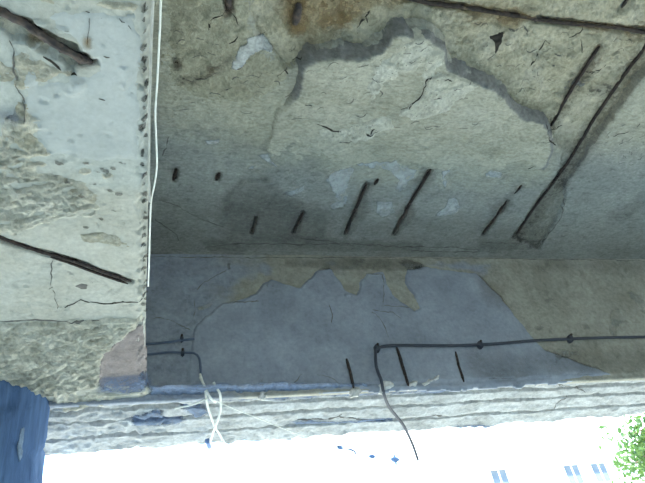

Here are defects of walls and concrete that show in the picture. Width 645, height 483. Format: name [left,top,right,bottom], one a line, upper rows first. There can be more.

crack [9,40,26,122]
spalling [158,0,645,247]
crack [0,261,143,324]
spalling [53,254,152,412]
spalling [346,358,362,398]
spalling [396,347,439,391]